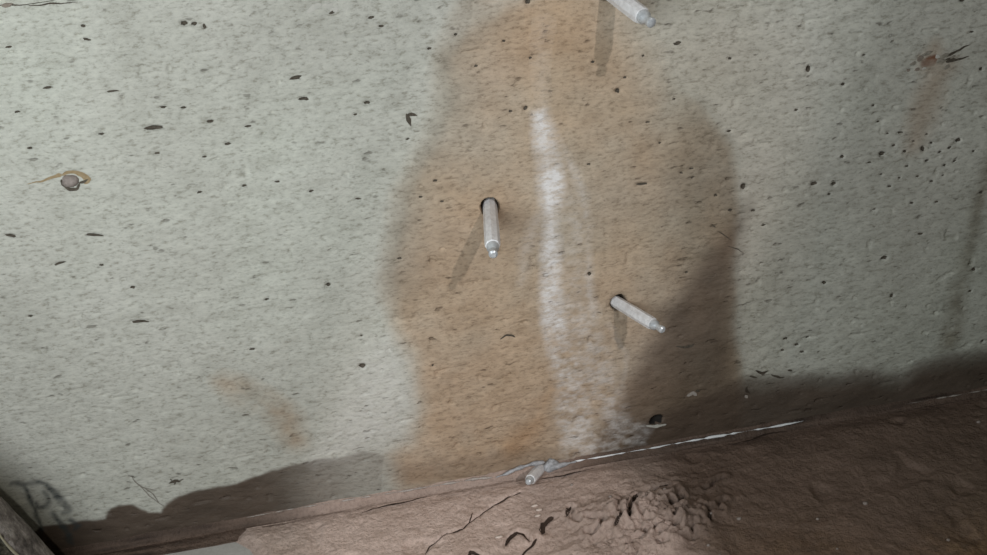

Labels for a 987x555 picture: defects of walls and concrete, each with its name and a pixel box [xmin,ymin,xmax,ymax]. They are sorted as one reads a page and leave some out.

crack [0,0,73,8]
corrosion [897,33,969,162]
leakage [303,0,987,471]
crack [425,492,521,555]
crack [505,507,571,555]
crack [614,485,684,526]